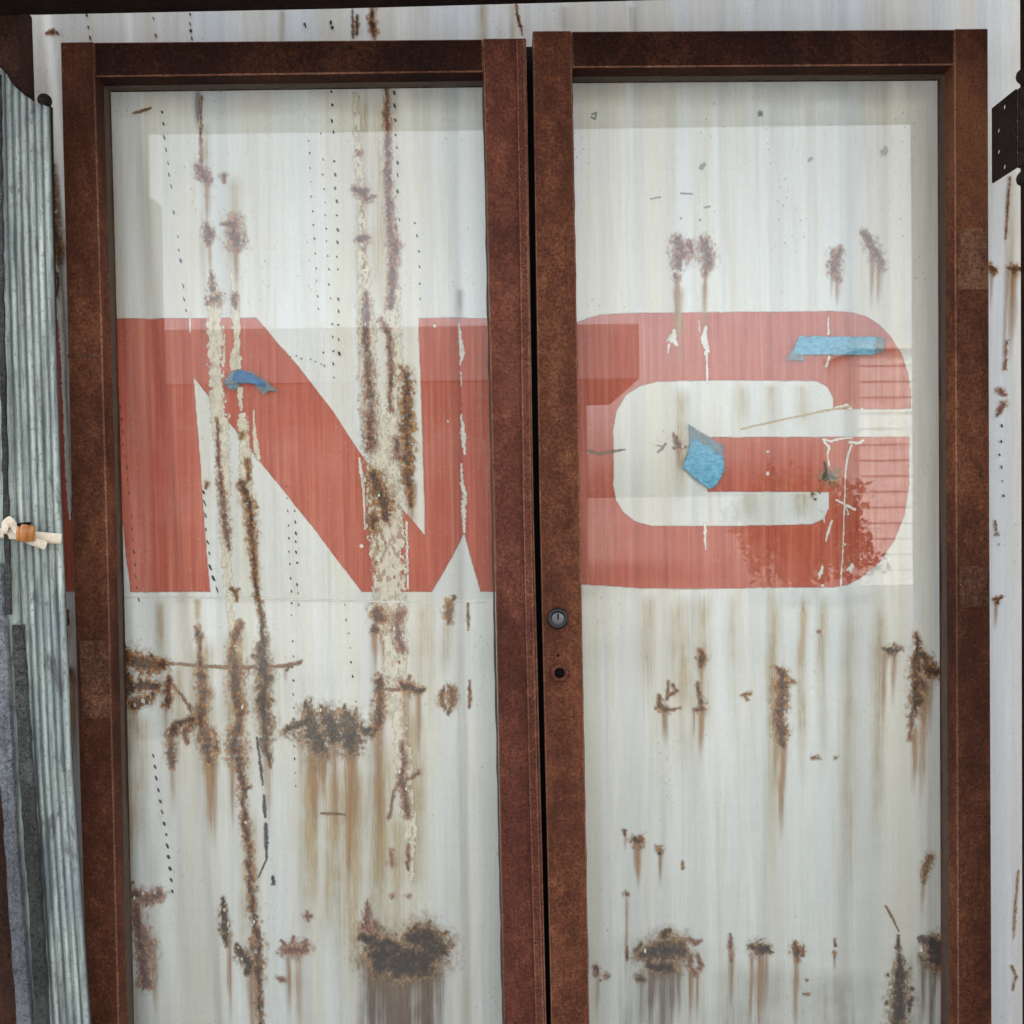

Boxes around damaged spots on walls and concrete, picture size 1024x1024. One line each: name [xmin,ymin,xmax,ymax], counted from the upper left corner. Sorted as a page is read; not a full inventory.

corrosion [194,96,229,203]
corrosion [202,211,249,309]
corrosion [351,89,418,546]
corrosion [666,233,716,310]
corrosion [125,417,426,1024]
corrosion [654,680,707,742]
corrosion [772,665,796,806]
corrosion [881,631,940,769]
corrosion [356,900,455,1024]
corrosion [625,927,704,1020]
corrosion [789,941,810,1006]
corrosion [884,934,941,1024]